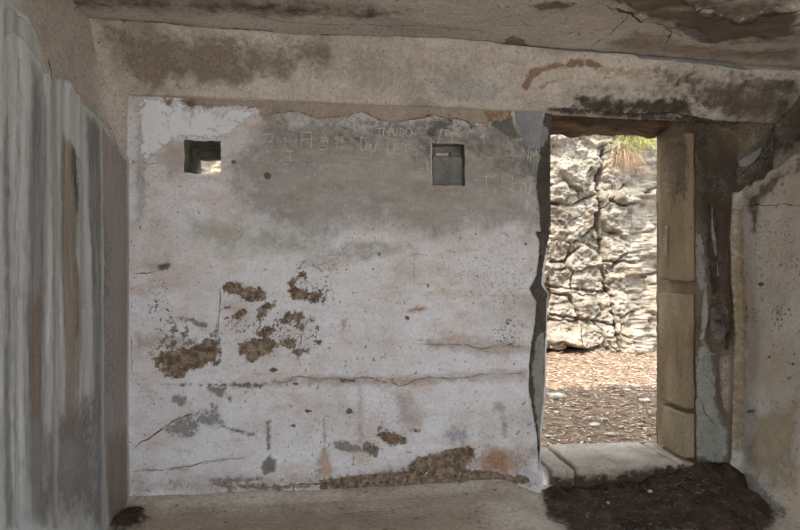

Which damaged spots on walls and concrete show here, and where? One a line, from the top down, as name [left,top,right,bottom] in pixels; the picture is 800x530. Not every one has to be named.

leakage [104,26,329,89]
rust [522,59,602,90]
crack [569,5,754,67]
leakage [5,8,128,527]
peeling [163,97,552,470]
leakage [549,72,800,516]
flaking render [152,334,223,381]
crack [270,371,526,387]
crack [426,344,531,352]
crack [133,413,199,448]
crack [134,457,247,473]
flaking render [212,445,529,492]